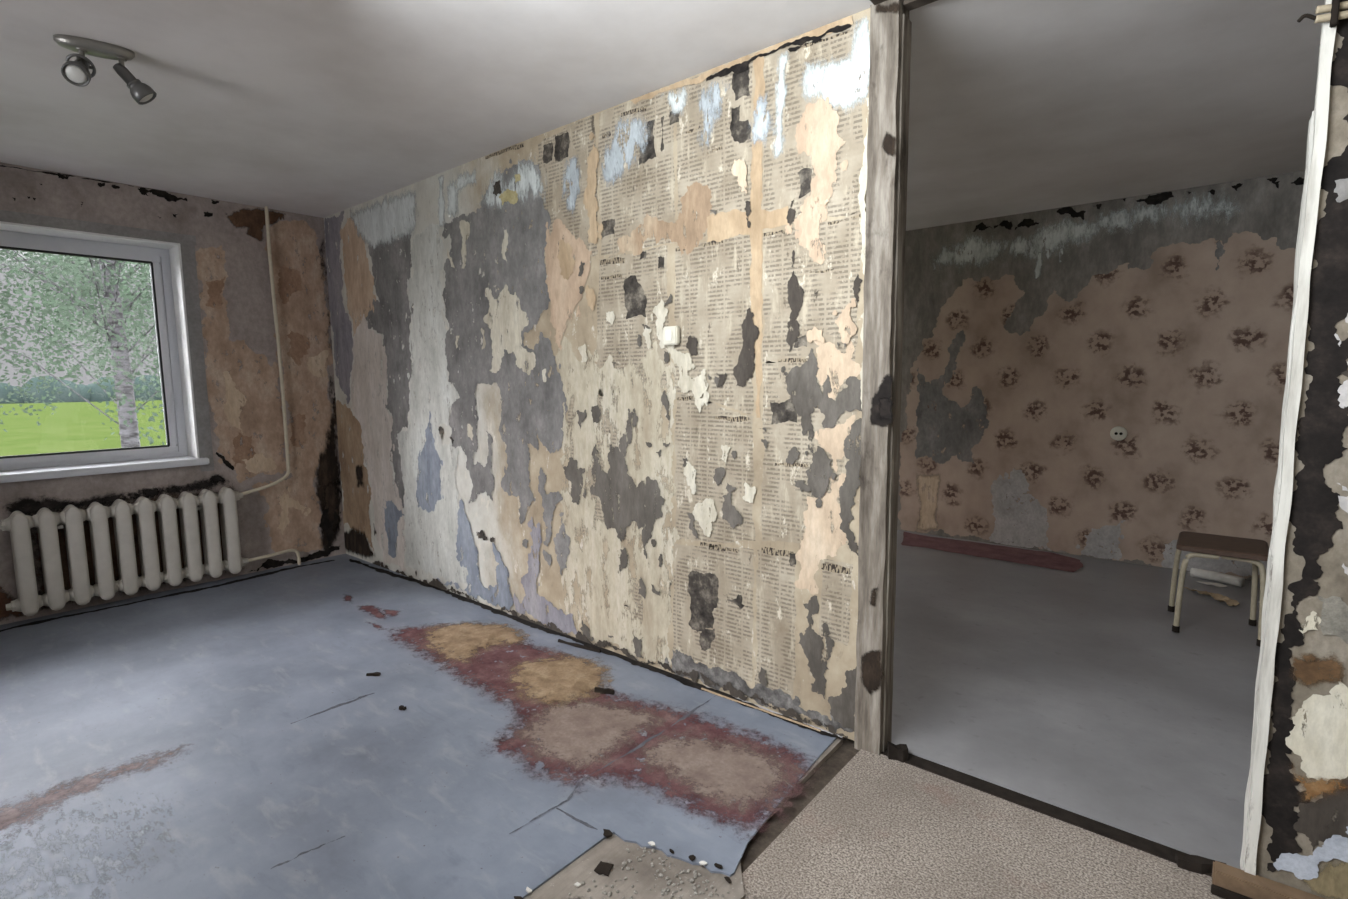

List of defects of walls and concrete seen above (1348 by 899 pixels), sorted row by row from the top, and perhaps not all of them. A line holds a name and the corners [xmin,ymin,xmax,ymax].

peeling [138,187,187,218]
peeling [1057,204,1102,220]
peeling [1121,192,1191,206]
peeling [1267,177,1304,189]
flaking render [1334,178,1348,202]
peeling [973,219,1040,232]
peeling [218,371,277,474]
peeling [287,159,863,836]
peeling [1331,483,1348,513]
peeling [1299,611,1321,633]
peeling [1329,681,1348,705]
flaking render [1293,779,1348,853]